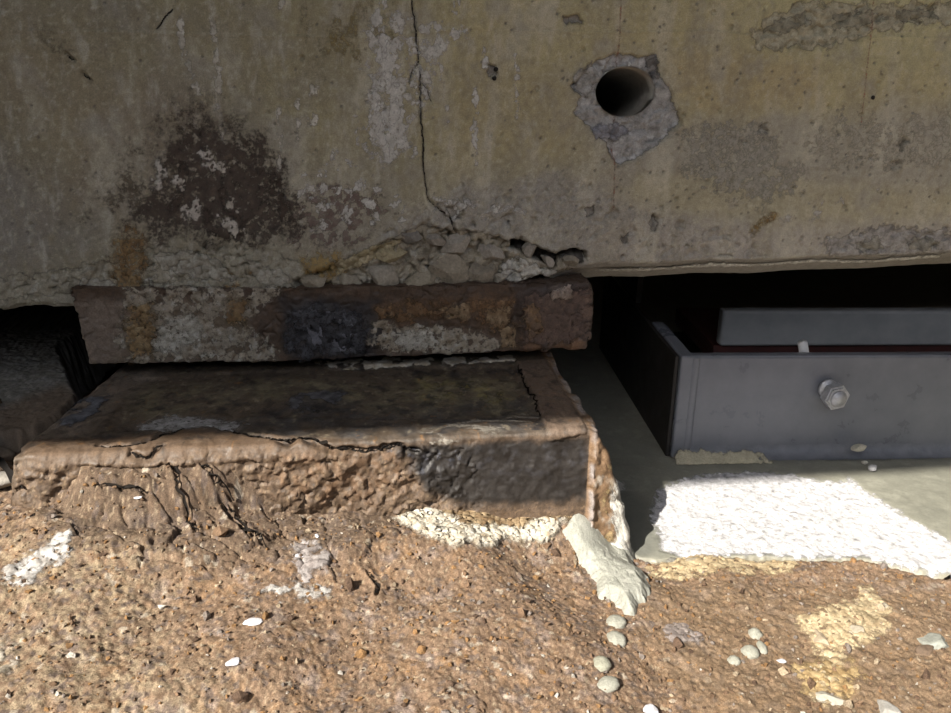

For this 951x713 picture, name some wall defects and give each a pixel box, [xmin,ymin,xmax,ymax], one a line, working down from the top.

spalling [750,0,951,52]
water stain [98,18,406,255]
crack [409,0,455,231]
spalling [571,54,679,164]
spalling [0,224,584,301]
rust [123,302,159,359]
rust [312,297,520,370]
crack [517,365,541,416]
crack [0,457,23,489]
crack [97,428,266,546]
crack [223,430,417,453]